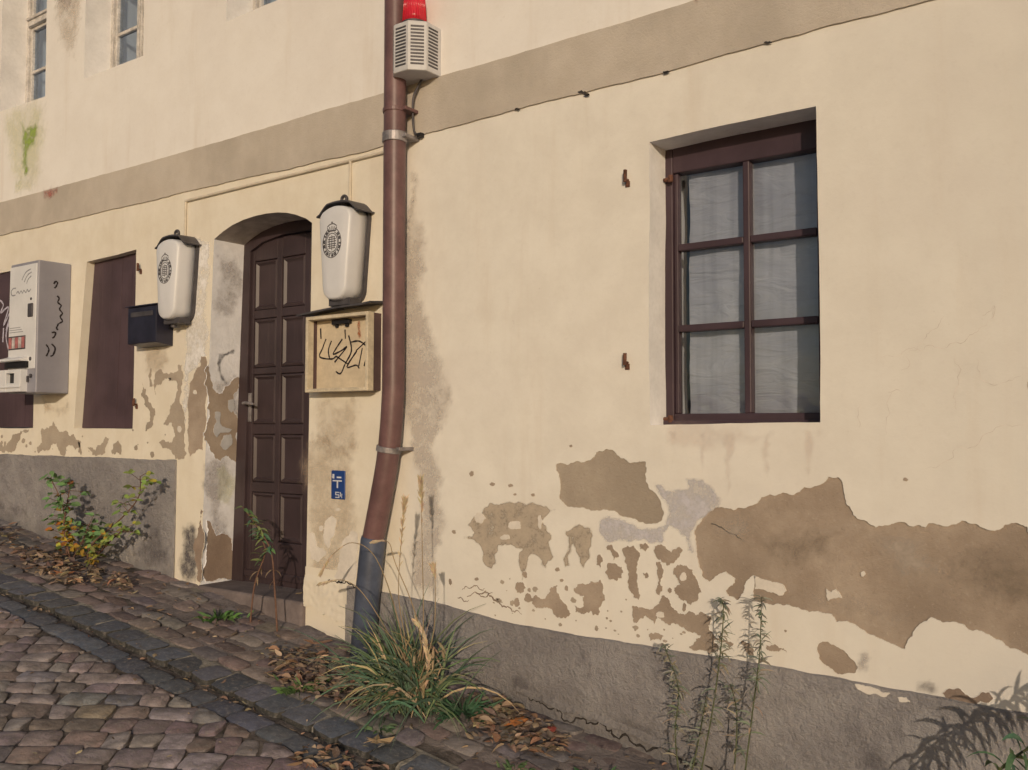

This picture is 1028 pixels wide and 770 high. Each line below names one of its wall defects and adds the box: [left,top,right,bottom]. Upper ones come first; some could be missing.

damp [23,127,36,173]
peeling [0,350,239,463]
spalling [193,509,233,583]
peeling [468,484,788,658]
flaking render [826,589,842,601]